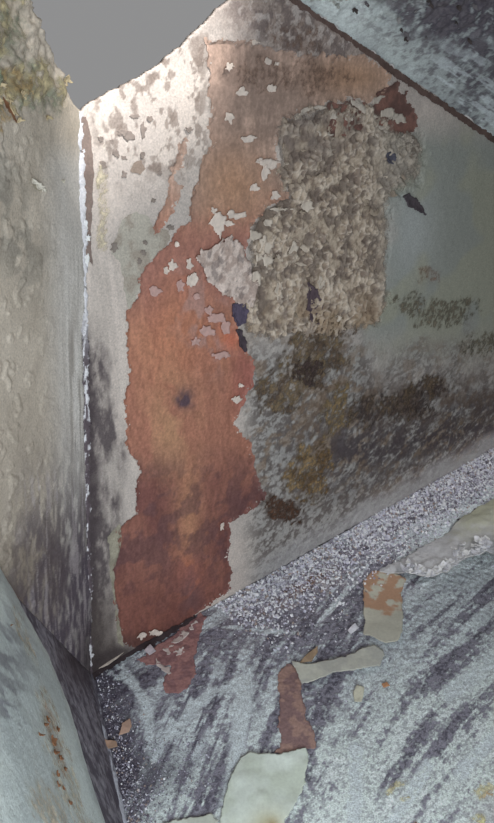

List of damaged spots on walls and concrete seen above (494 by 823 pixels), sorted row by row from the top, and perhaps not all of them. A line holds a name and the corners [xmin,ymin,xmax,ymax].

damp [0,0,67,132]
spalling [403,193,427,216]
peeling [98,37,420,694]
damp [254,312,357,415]
damp [348,374,453,430]
damp [393,291,480,329]
peeling [348,499,494,643]
rust [31,694,85,823]